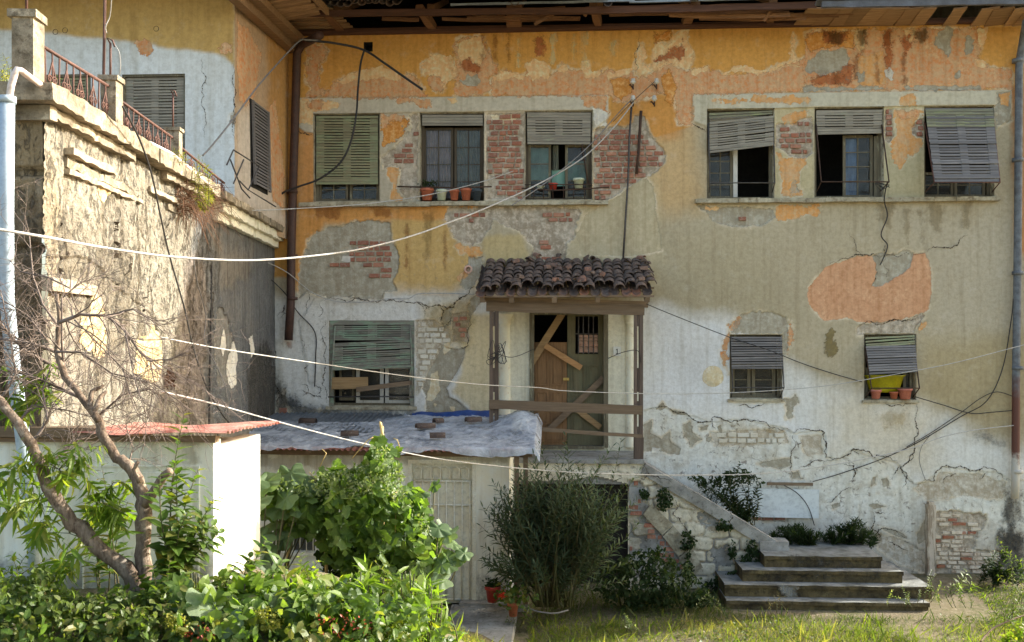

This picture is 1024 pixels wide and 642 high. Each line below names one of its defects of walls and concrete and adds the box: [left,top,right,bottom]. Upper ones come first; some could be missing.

peeling [298,25,1014,412]
spalling [643,394,824,456]
crack [651,403,1004,502]
spalling [876,472,1006,574]